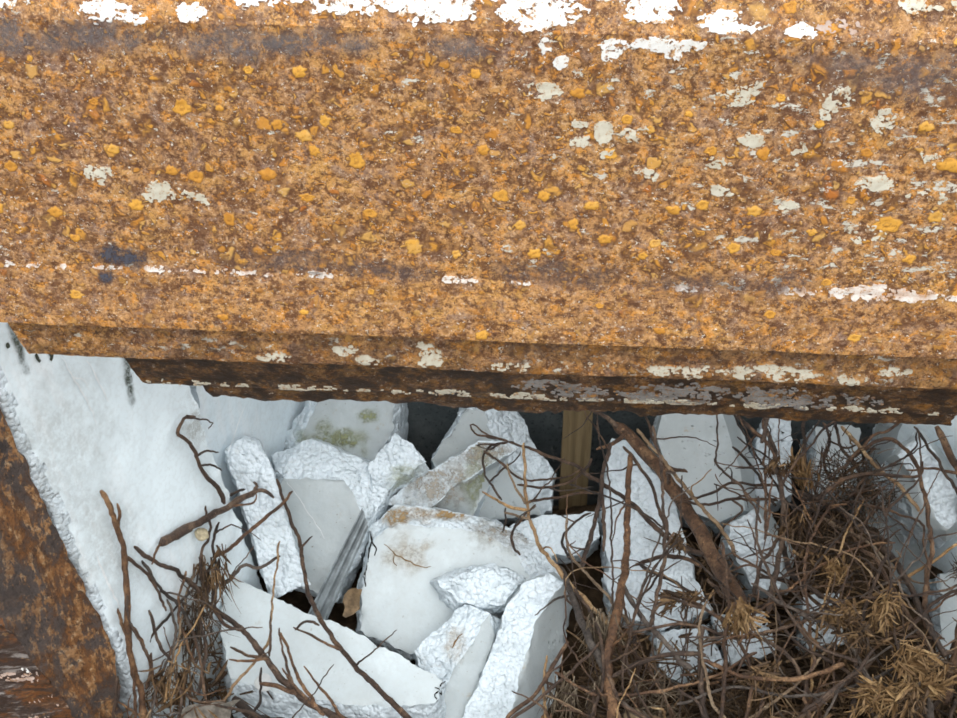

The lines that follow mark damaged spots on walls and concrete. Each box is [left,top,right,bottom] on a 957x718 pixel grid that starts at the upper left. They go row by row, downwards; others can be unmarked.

peeling [77,0,149,26]
peeling [175,2,209,23]
peeling [234,0,683,70]
peeling [597,9,764,62]
corrosion [292,65,308,78]
corrosion [294,129,322,157]
corrosion [935,156,957,173]
corrosion [746,205,763,217]
corrosion [870,216,904,233]
corrosion [404,238,423,256]
peeling [777,284,957,305]
peeling [490,362,913,414]